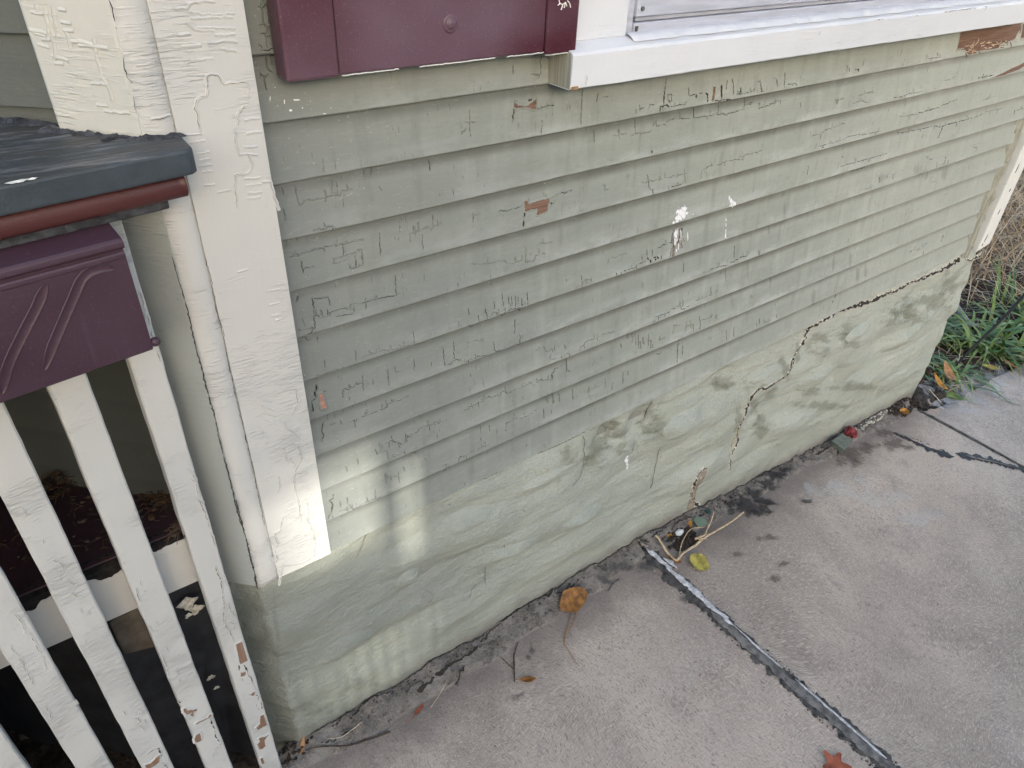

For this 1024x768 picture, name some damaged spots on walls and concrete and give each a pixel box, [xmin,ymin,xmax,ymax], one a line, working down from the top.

peeling [956,23,1024,58]
peeling [978,61,1024,80]
peeling [512,97,554,122]
crack [123,0,400,340]
peeling [498,189,572,227]
crack [139,292,162,362]
crack [615,235,983,553]
peeling [234,639,250,678]
peeling [177,700,222,746]
peeling [254,712,270,766]